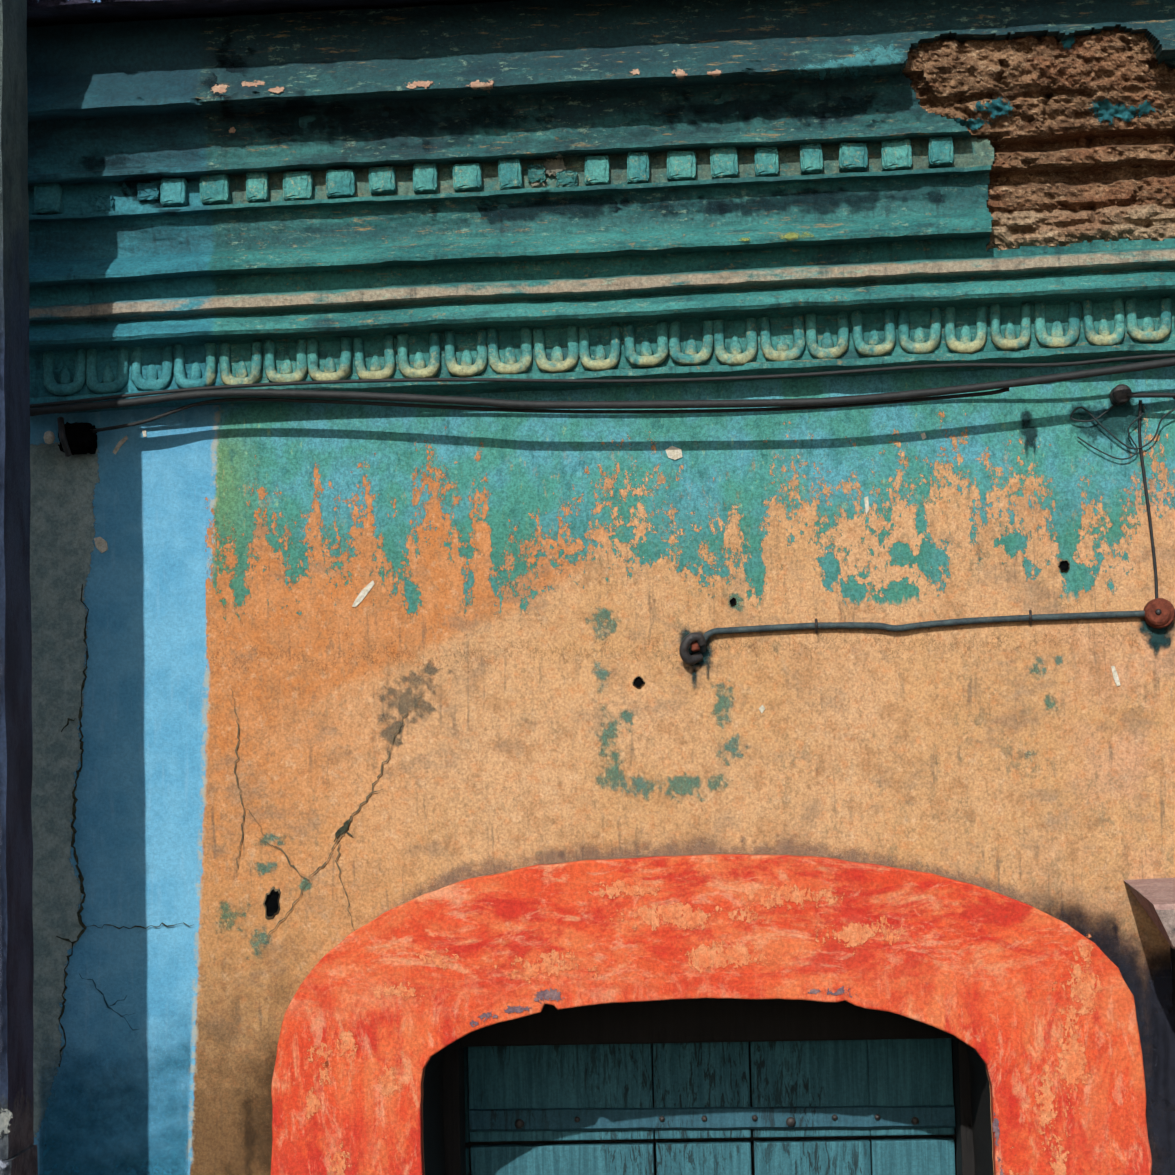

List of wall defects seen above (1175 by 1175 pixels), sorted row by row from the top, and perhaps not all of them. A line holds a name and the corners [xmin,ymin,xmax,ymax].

spalling [791,27,1175,251]
peeling [205,406,1175,675]
crack [56,584,194,1067]
crack [230,688,423,942]
leakage [379,663,437,755]
peeling [0,1108,13,1135]
leakage [1047,907,1175,1175]